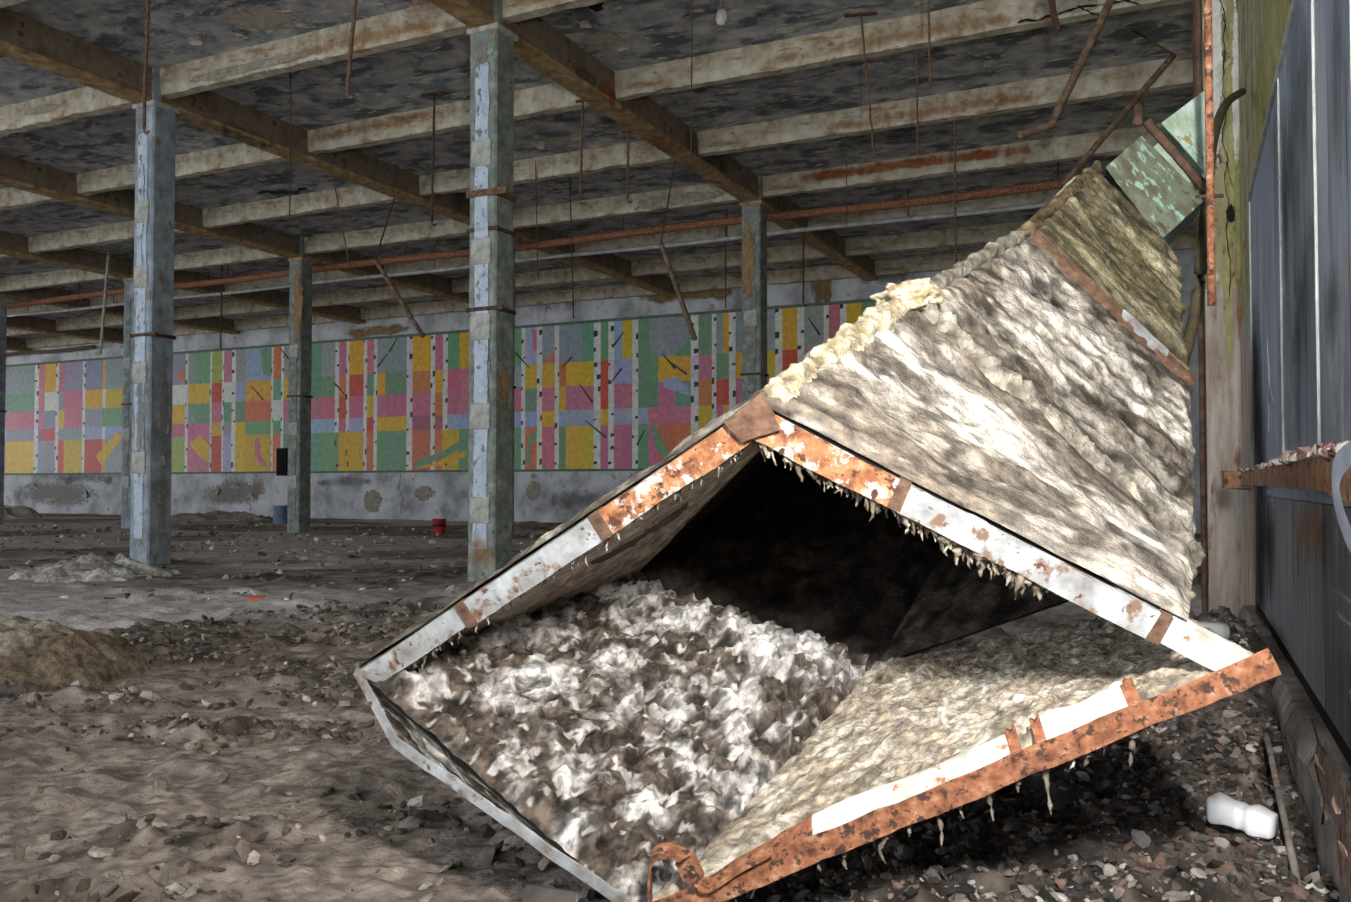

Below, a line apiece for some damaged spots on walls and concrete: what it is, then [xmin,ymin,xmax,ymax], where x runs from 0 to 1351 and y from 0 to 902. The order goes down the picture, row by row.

rust [813,149,1028,181]
crack [1017,0,1140,23]
crack [1219,0,1233,310]
leakage [1224,69,1265,368]